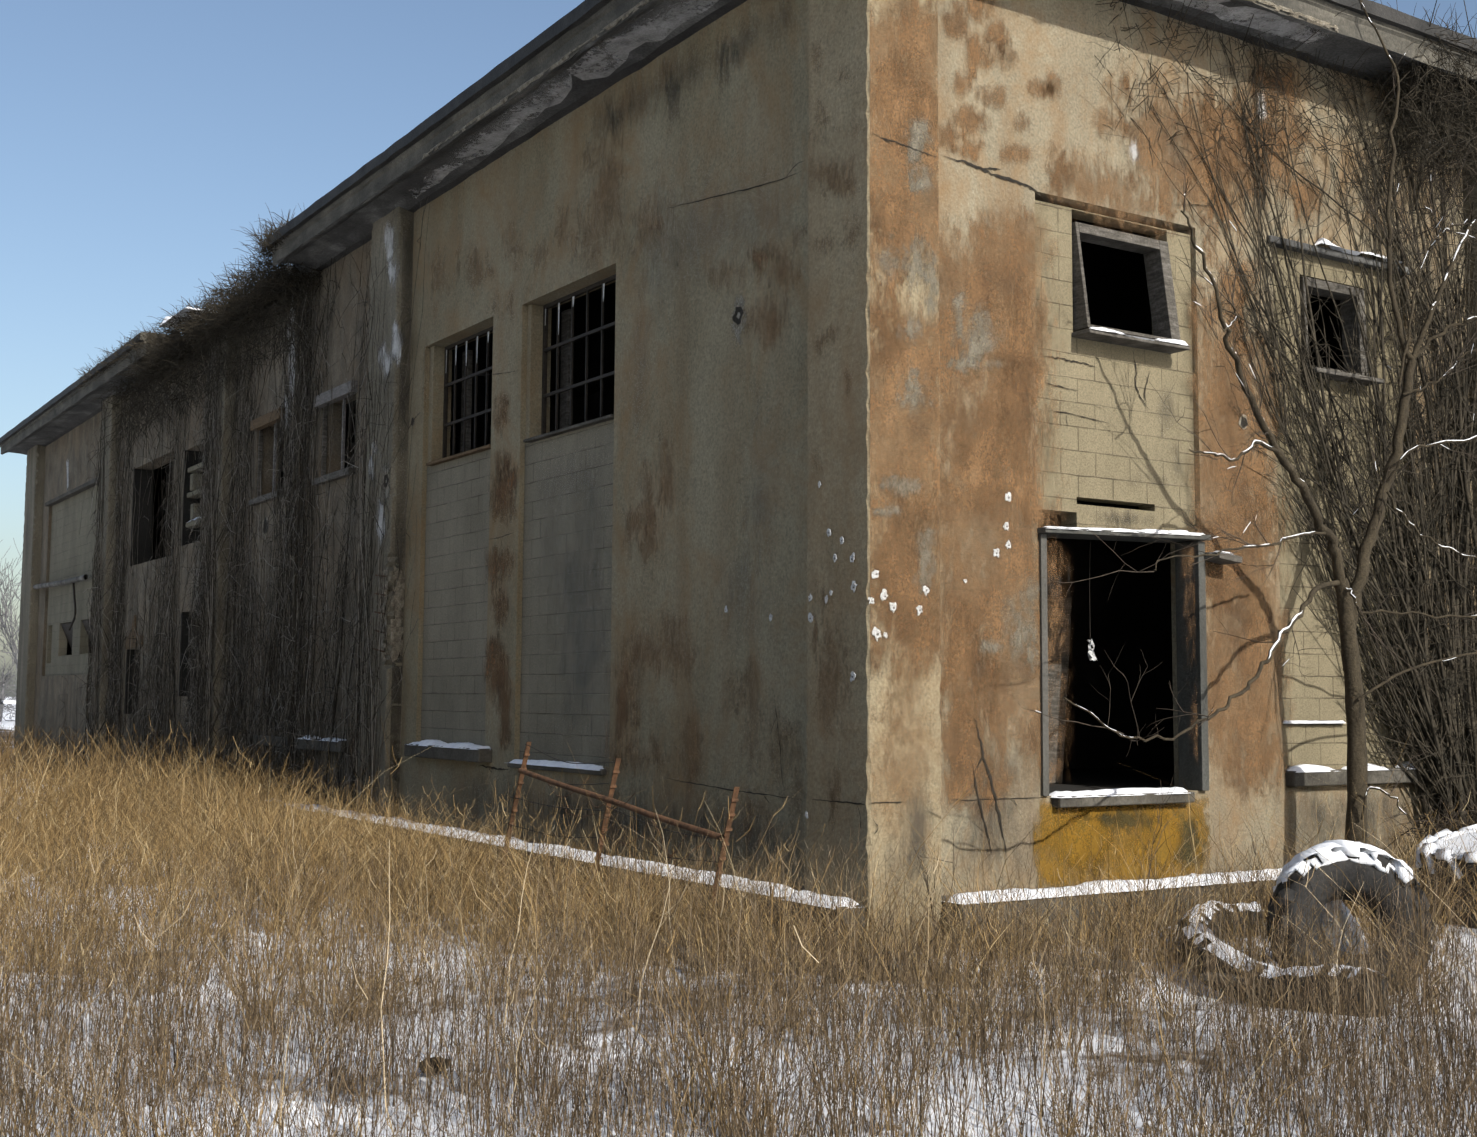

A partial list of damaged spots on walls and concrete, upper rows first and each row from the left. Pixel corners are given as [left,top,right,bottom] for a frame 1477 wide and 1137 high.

spalling [422,0,649,159]
crack [661,160,805,210]
crack [872,133,1039,194]